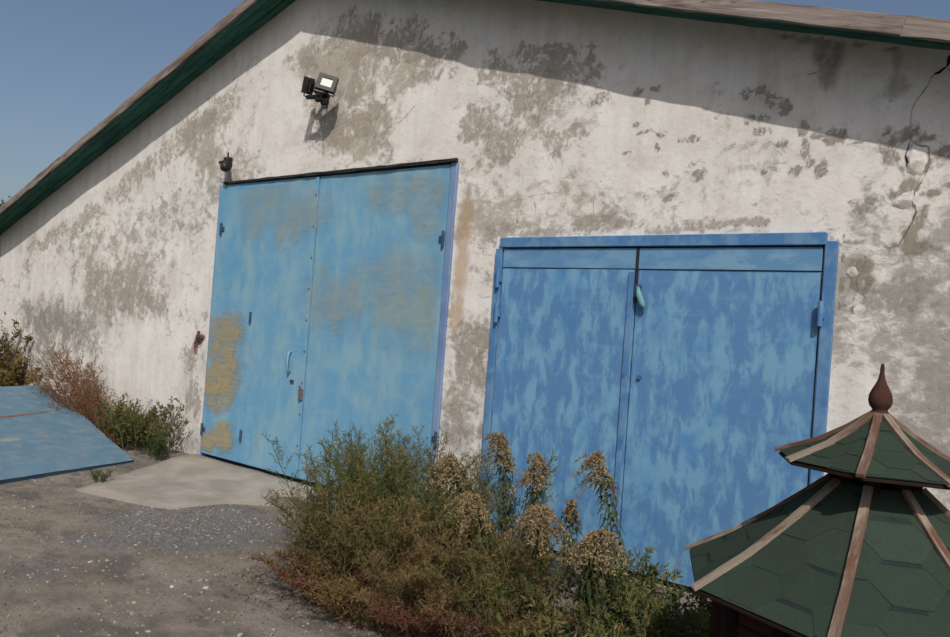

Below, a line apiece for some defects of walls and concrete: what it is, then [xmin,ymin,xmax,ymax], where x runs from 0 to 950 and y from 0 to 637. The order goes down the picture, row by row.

peeling [301,8,468,150]
peeling [457,40,603,167]
flaking render [741,85,793,136]
flaking render [788,120,847,177]
peeling [849,126,950,255]
crack [852,55,950,313]
peeling [838,255,873,311]
corrosion [193,316,244,451]